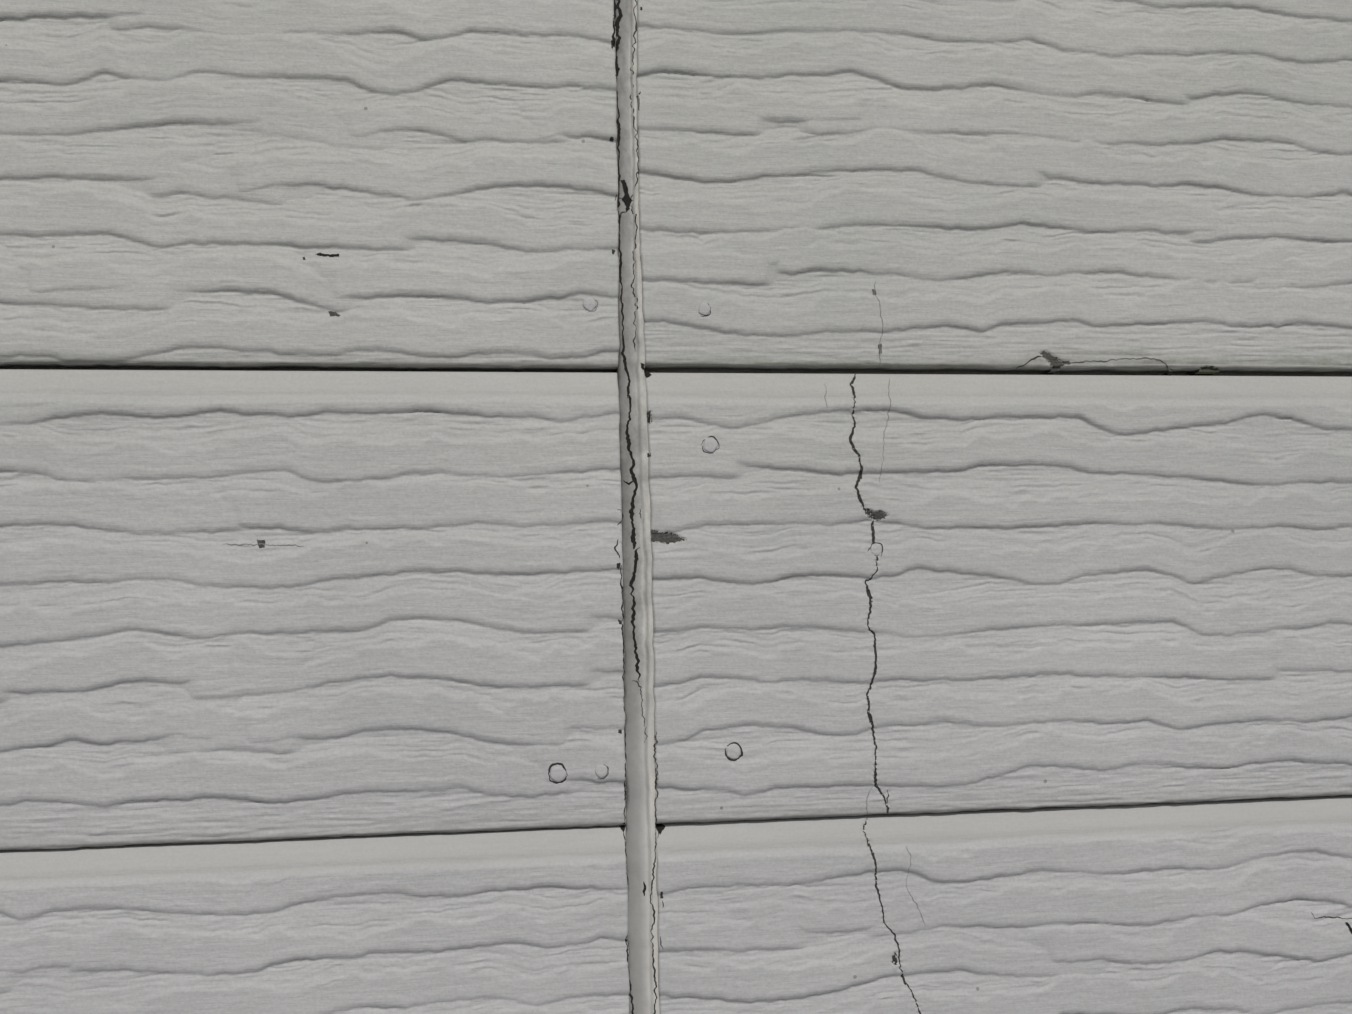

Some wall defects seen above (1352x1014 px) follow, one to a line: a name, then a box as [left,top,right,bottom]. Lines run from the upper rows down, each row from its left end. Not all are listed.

crack [612,0,641,348]
crack [614,395,664,1014]
crack [825,282,926,1014]